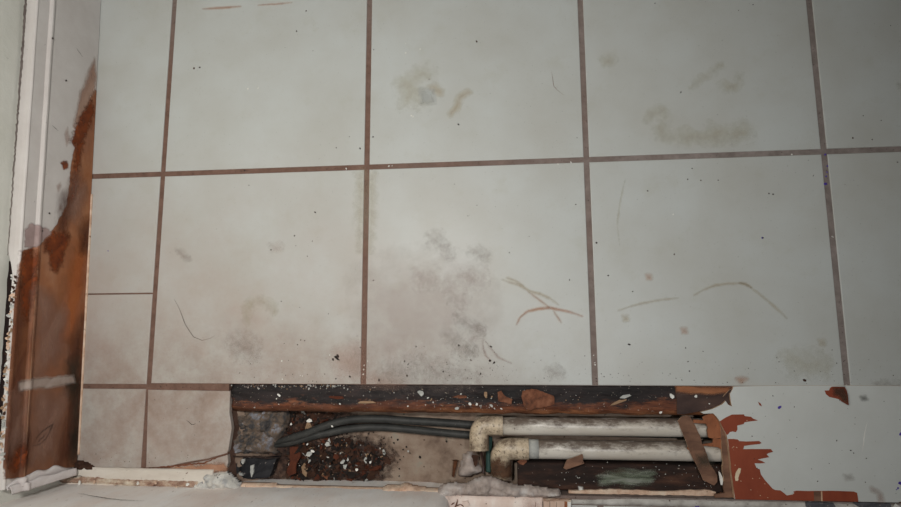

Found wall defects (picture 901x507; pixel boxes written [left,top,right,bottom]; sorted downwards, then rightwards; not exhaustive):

peeling [0,90,198,488]
peeling [825,387,849,405]
peeling [718,414,900,507]